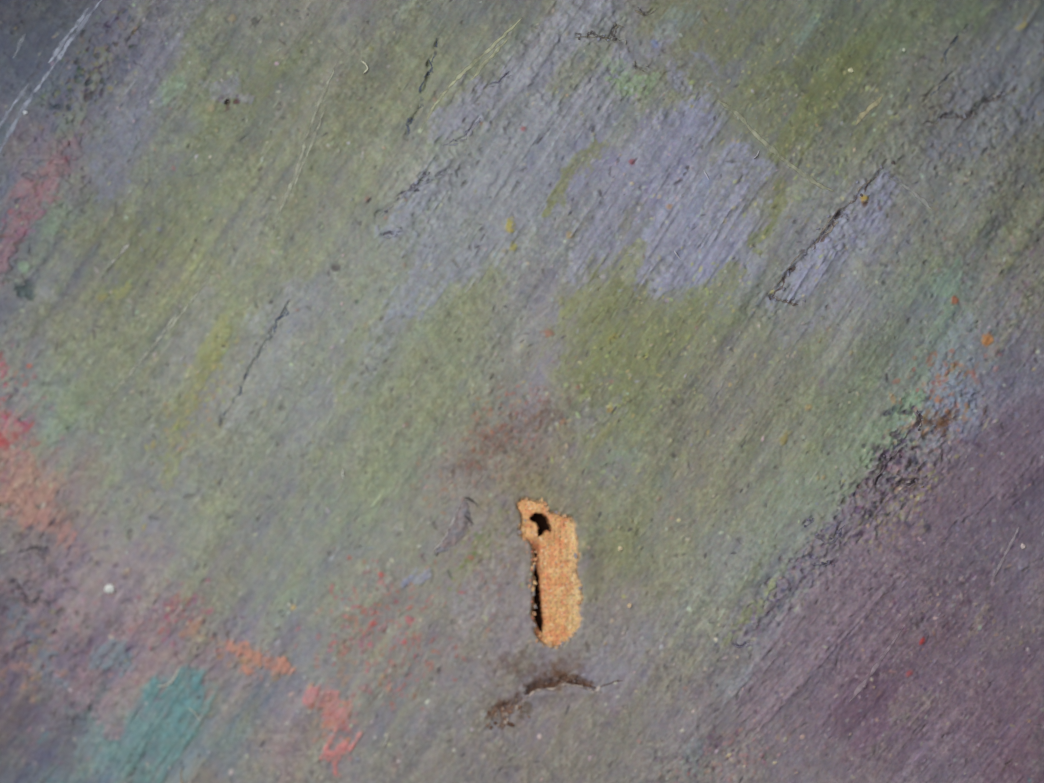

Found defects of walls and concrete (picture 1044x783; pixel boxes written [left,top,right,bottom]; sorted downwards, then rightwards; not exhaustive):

crack [769,161,895,306]
crack [219,301,289,426]
peeling [516,497,584,649]